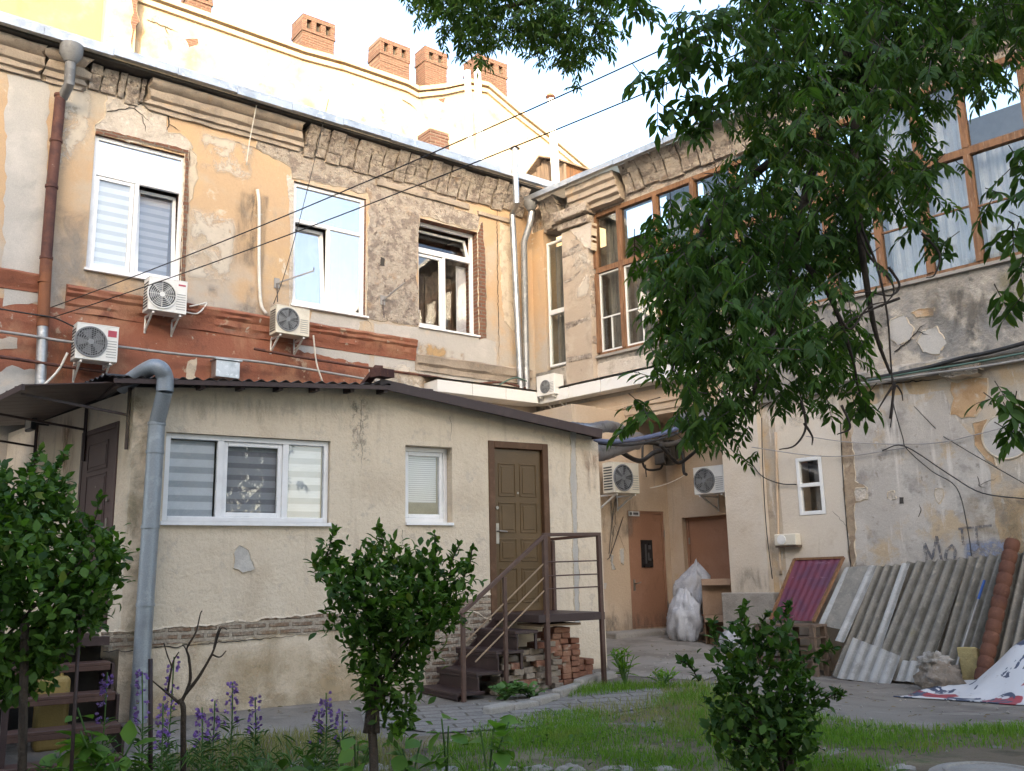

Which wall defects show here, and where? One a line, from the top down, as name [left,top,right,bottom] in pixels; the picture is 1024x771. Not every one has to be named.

crack [107,103,180,131]
flaking render [889,307,946,355]
flaking render [840,362,1001,567]
flaking render [99,629,135,651]
flaking render [152,611,365,648]